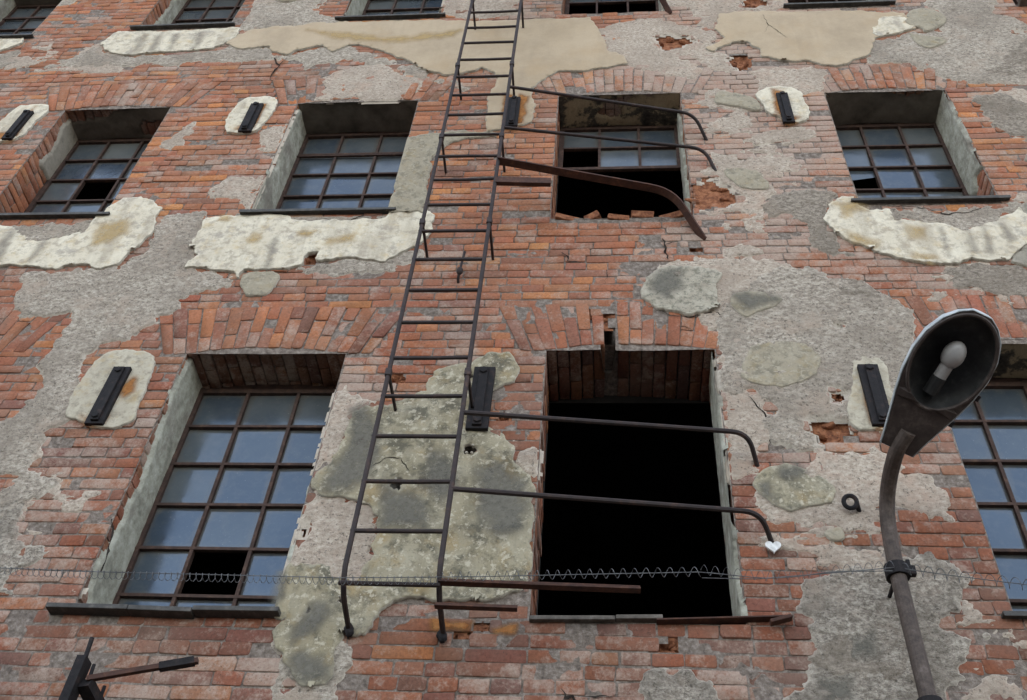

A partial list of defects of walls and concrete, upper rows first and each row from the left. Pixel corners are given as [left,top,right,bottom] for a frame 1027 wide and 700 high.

peeling [0,37,58,70]
peeling [685,88,1027,306]
peeling [0,196,435,596]
spalling [589,309,616,373]
peeling [270,352,544,700]
peeling [638,242,919,700]
peeling [895,464,957,523]
crack [561,689,619,700]
peeling [902,551,1027,700]